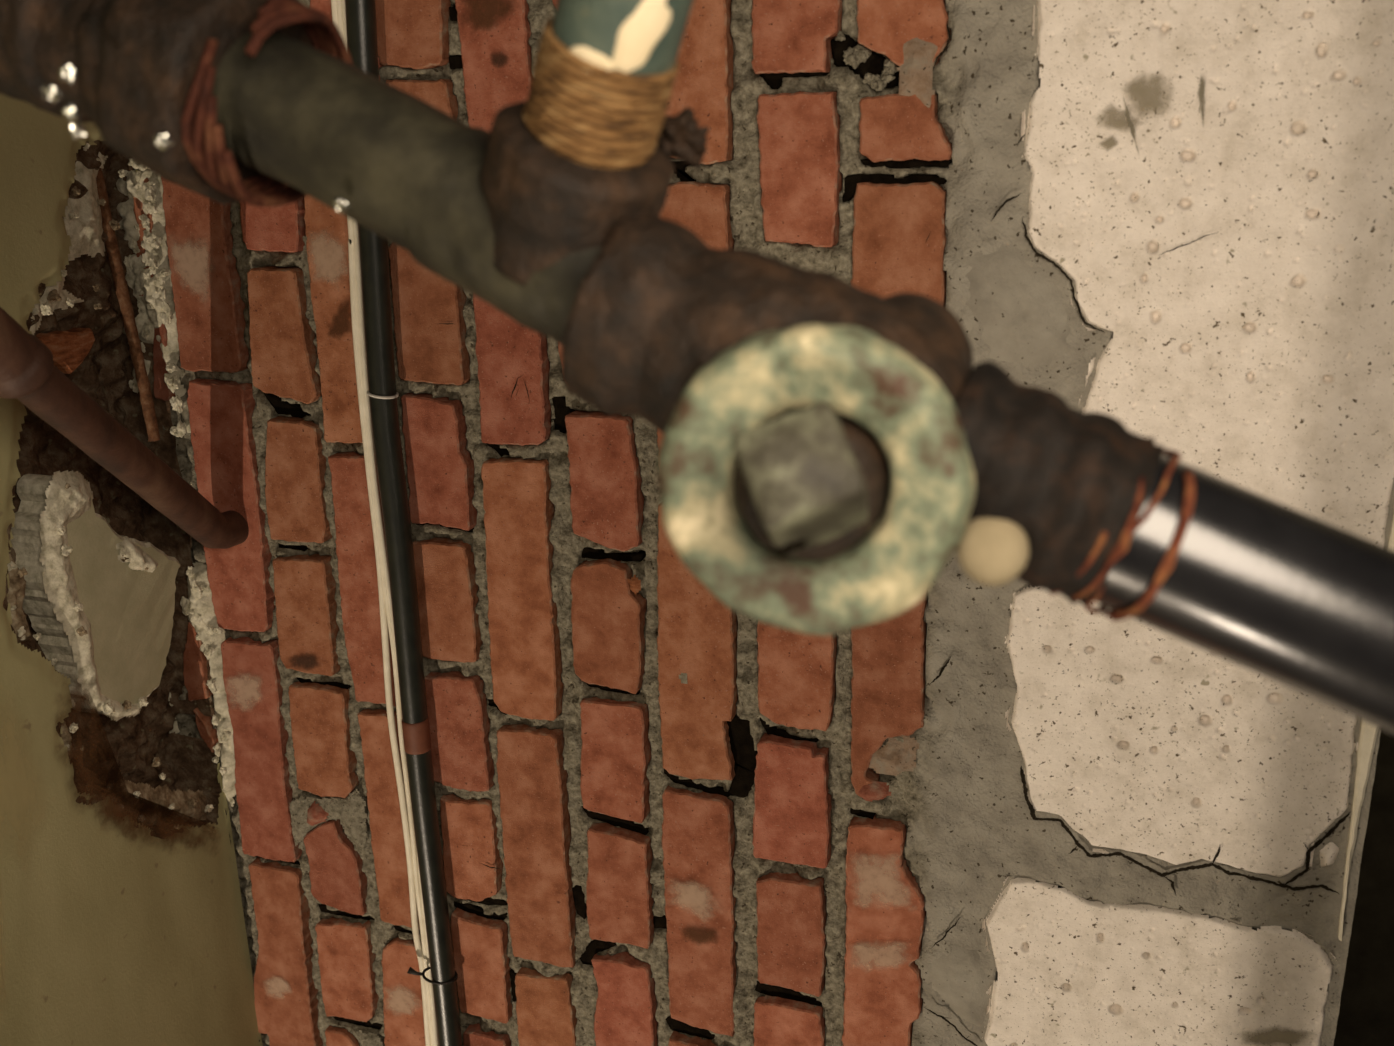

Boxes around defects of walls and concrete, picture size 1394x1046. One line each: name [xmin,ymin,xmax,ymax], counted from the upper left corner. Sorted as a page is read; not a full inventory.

peeling [569,0,672,73]
spalling [830,30,900,91]
water stain [1101,77,1164,149]
spalling [26,140,191,479]
spalling [3,404,236,839]
spalling [727,713,758,798]
spalling [858,735,919,802]
spalling [289,789,368,851]
crack [1020,766,1350,895]
spalling [351,1030,383,1046]